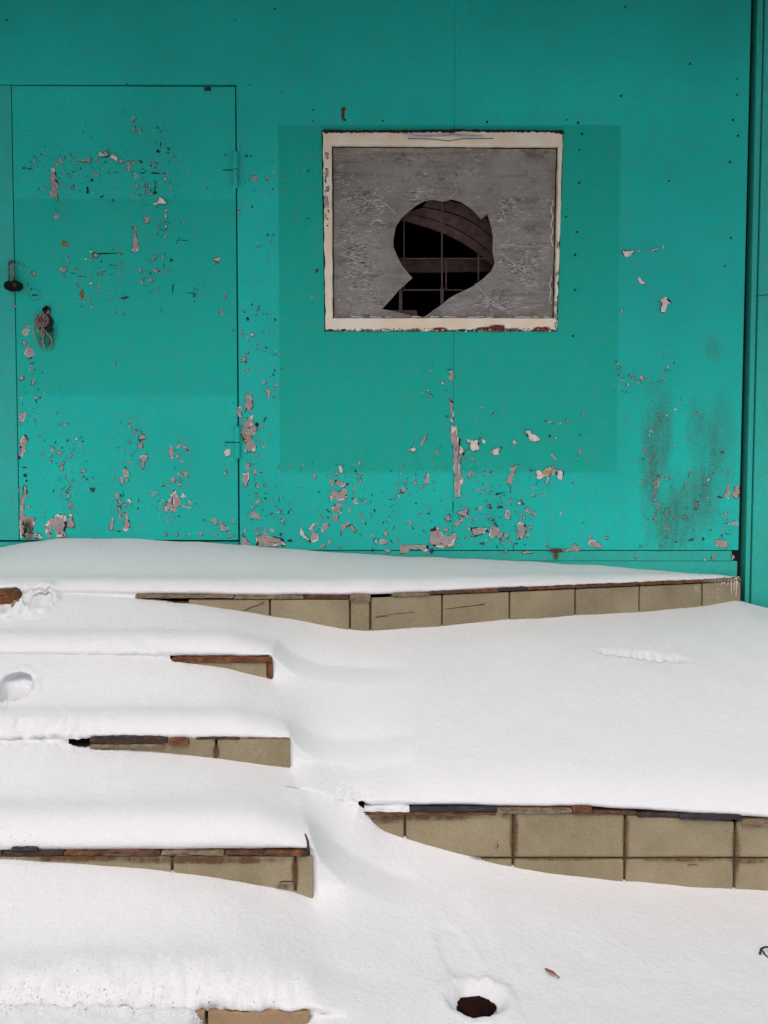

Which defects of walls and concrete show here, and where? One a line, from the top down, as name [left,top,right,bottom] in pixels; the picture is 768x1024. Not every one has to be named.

peeling [23,111,189,318]
peeling [659,296,672,313]
peeling [17,313,101,539]
peeling [108,362,574,554]
peeling [545,535,609,559]
peeling [632,399,740,561]